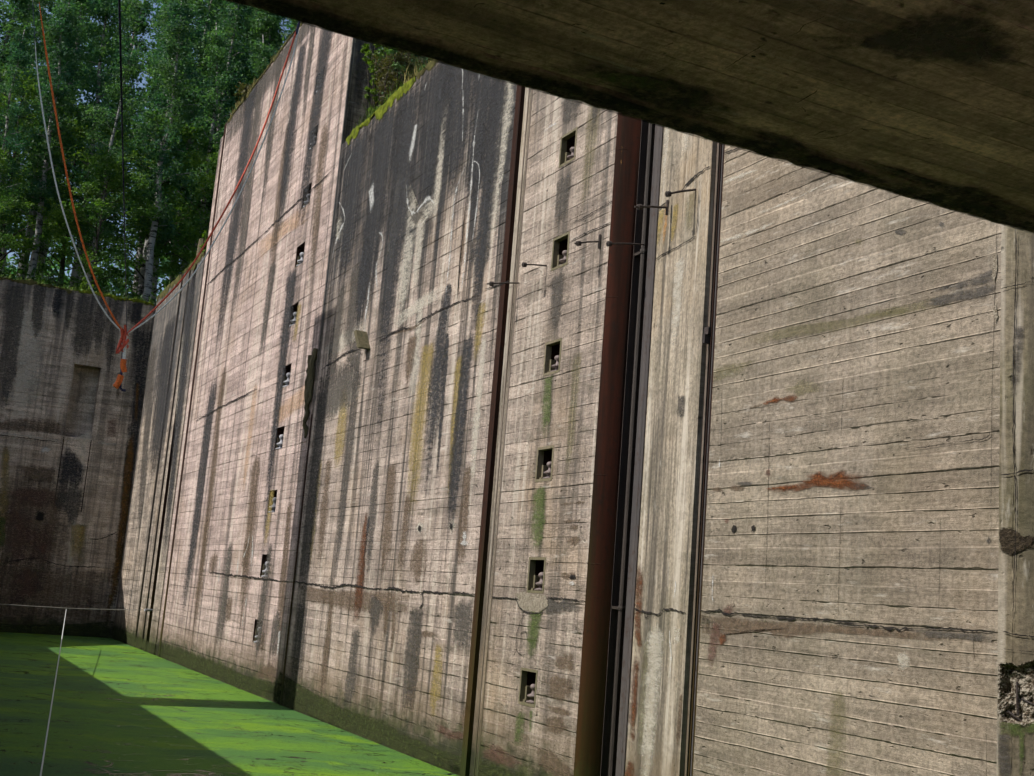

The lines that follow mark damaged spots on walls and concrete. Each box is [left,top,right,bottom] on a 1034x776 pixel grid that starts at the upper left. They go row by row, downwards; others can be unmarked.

damp [821,6,1015,65]
crack [196,389,255,421]
damp [182,24,423,702]
damp [329,64,512,581]
corrosion [750,395,796,408]
damp [0,276,195,621]
corrosion [766,470,871,491]
spalling [987,527,1034,554]
crack [209,571,527,656]
spalling [997,660,1034,770]